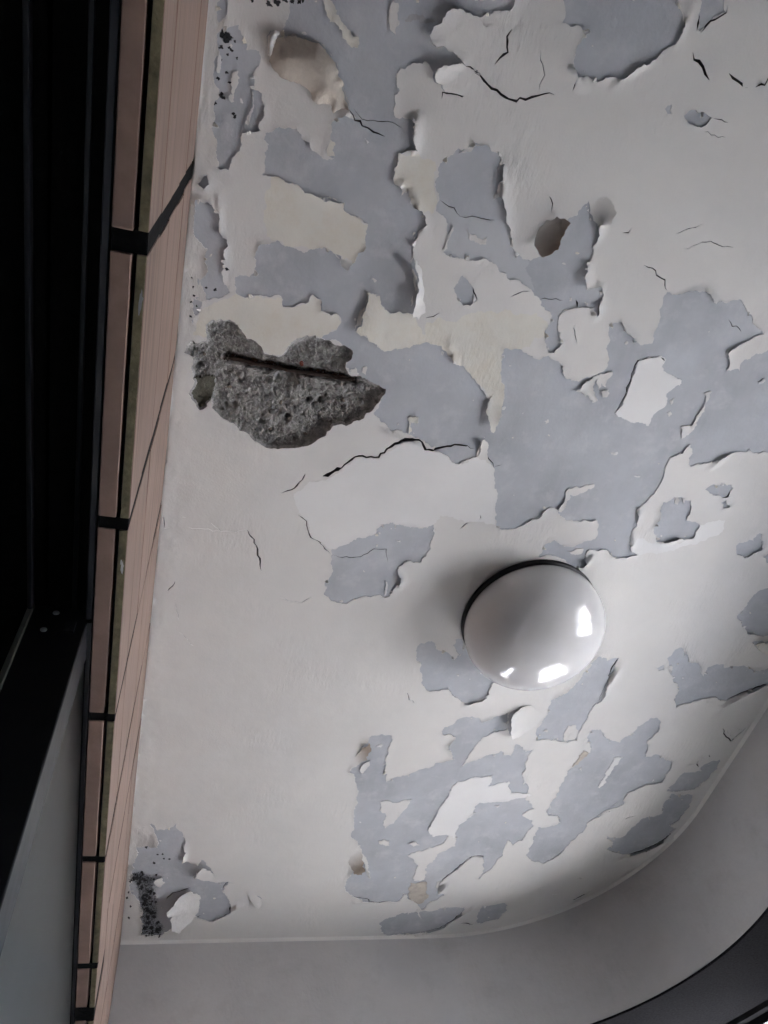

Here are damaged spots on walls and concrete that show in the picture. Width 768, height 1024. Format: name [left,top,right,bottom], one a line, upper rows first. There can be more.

crack [697,10,727,31]
crack [466,29,575,103]
crack [693,55,768,87]
crack [350,111,400,136]
peeling [184,0,768,568]
crack [282,438,500,493]
crack [219,529,261,569]
peeling [324,523,435,604]
peeling [657,647,768,707]
peeling [344,639,720,936]
damp [126,846,170,937]
peeling [129,824,231,935]